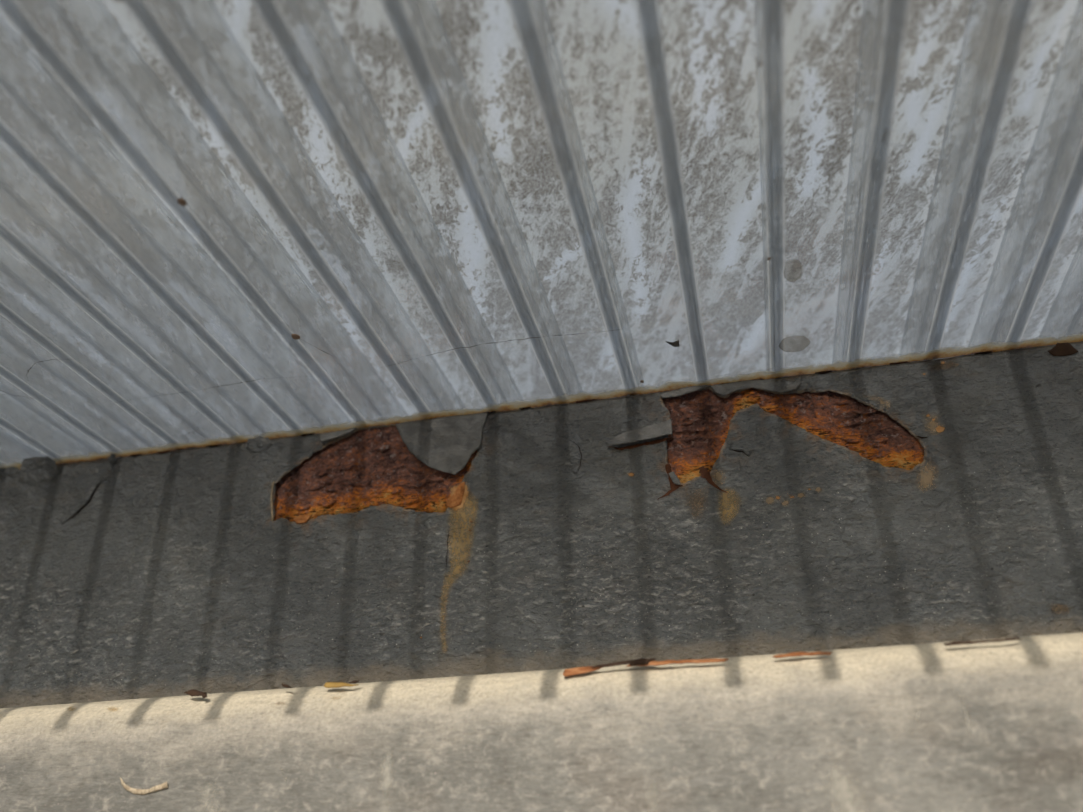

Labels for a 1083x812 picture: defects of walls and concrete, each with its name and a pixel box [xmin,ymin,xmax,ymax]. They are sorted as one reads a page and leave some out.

corrosion [52,334,1083,576]